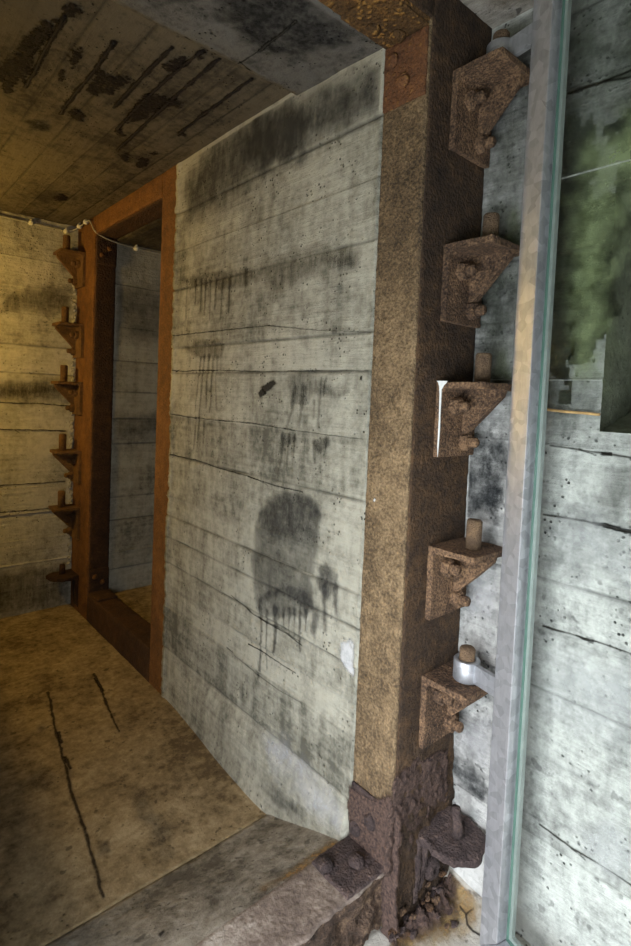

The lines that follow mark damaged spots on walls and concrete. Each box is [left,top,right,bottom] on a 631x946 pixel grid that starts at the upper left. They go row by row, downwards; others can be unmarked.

water stain [189,73,374,212]
water stain [259,495,337,652]
crack [92,673,120,732]
crack [46,692,105,898]
corrosion [347,749,475,946]